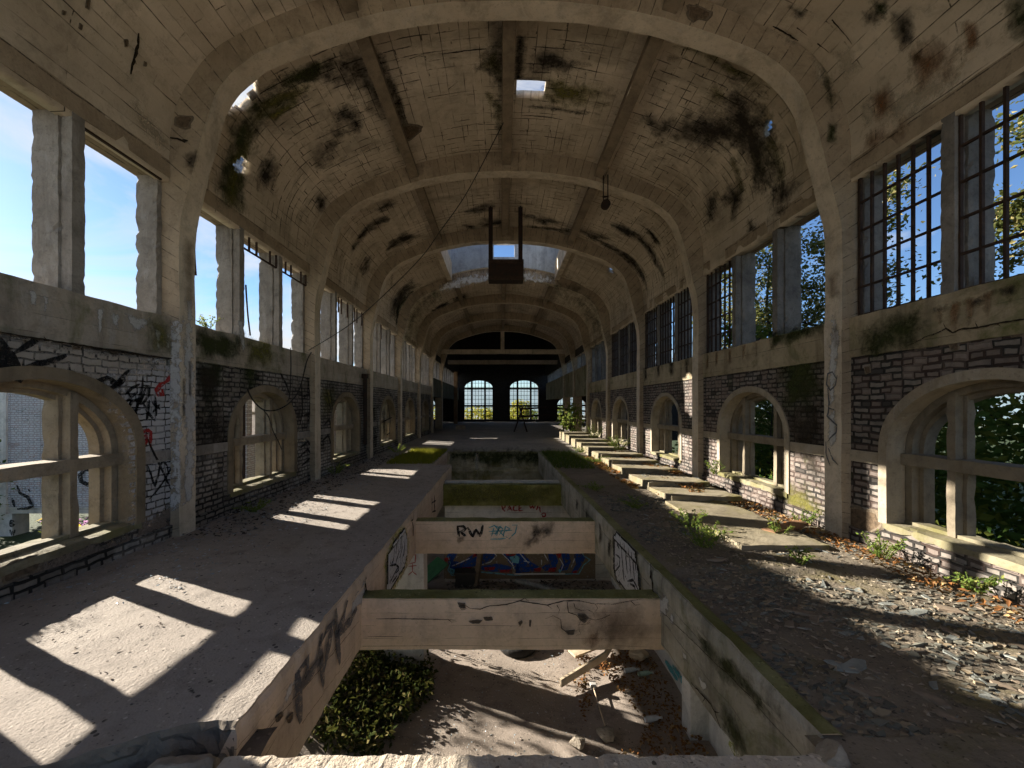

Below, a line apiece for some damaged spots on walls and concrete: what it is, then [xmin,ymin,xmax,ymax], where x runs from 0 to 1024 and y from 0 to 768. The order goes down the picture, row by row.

water stain [897,17,913,45]
crack [130,33,140,74]
water stain [515,37,573,79]
water stain [315,55,405,166]
water stain [646,77,791,220]
water stain [259,159,278,185]
crack [265,563,763,756]